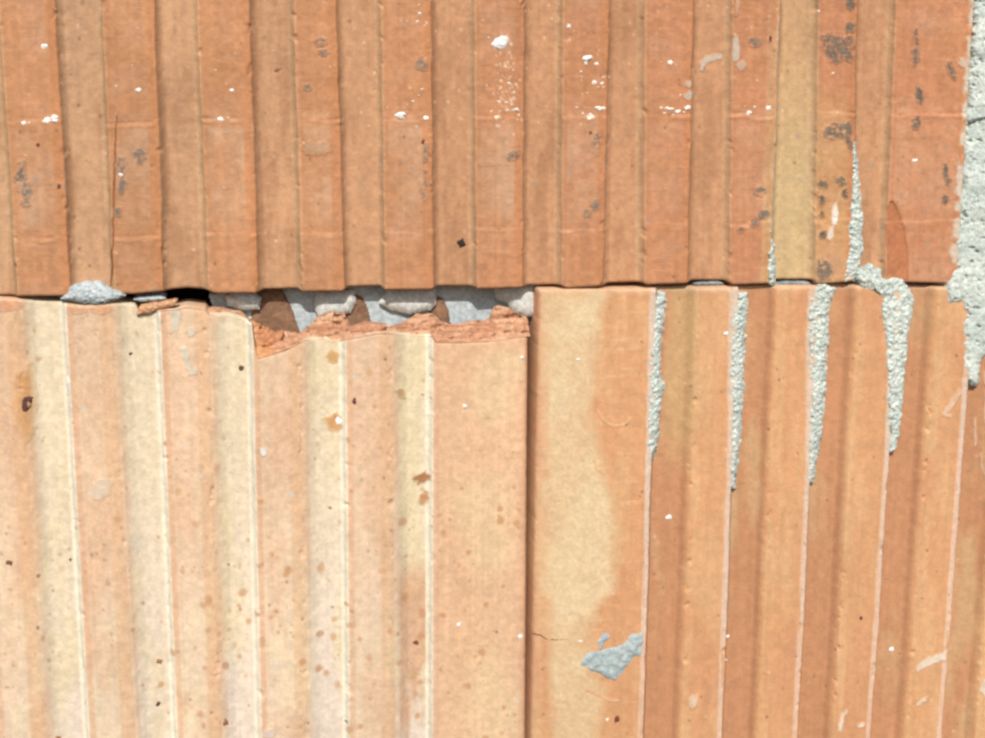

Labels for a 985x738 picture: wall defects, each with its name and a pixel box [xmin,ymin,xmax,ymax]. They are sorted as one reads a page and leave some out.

spalling [134,298,187,315]
spalling [208,305,530,359]